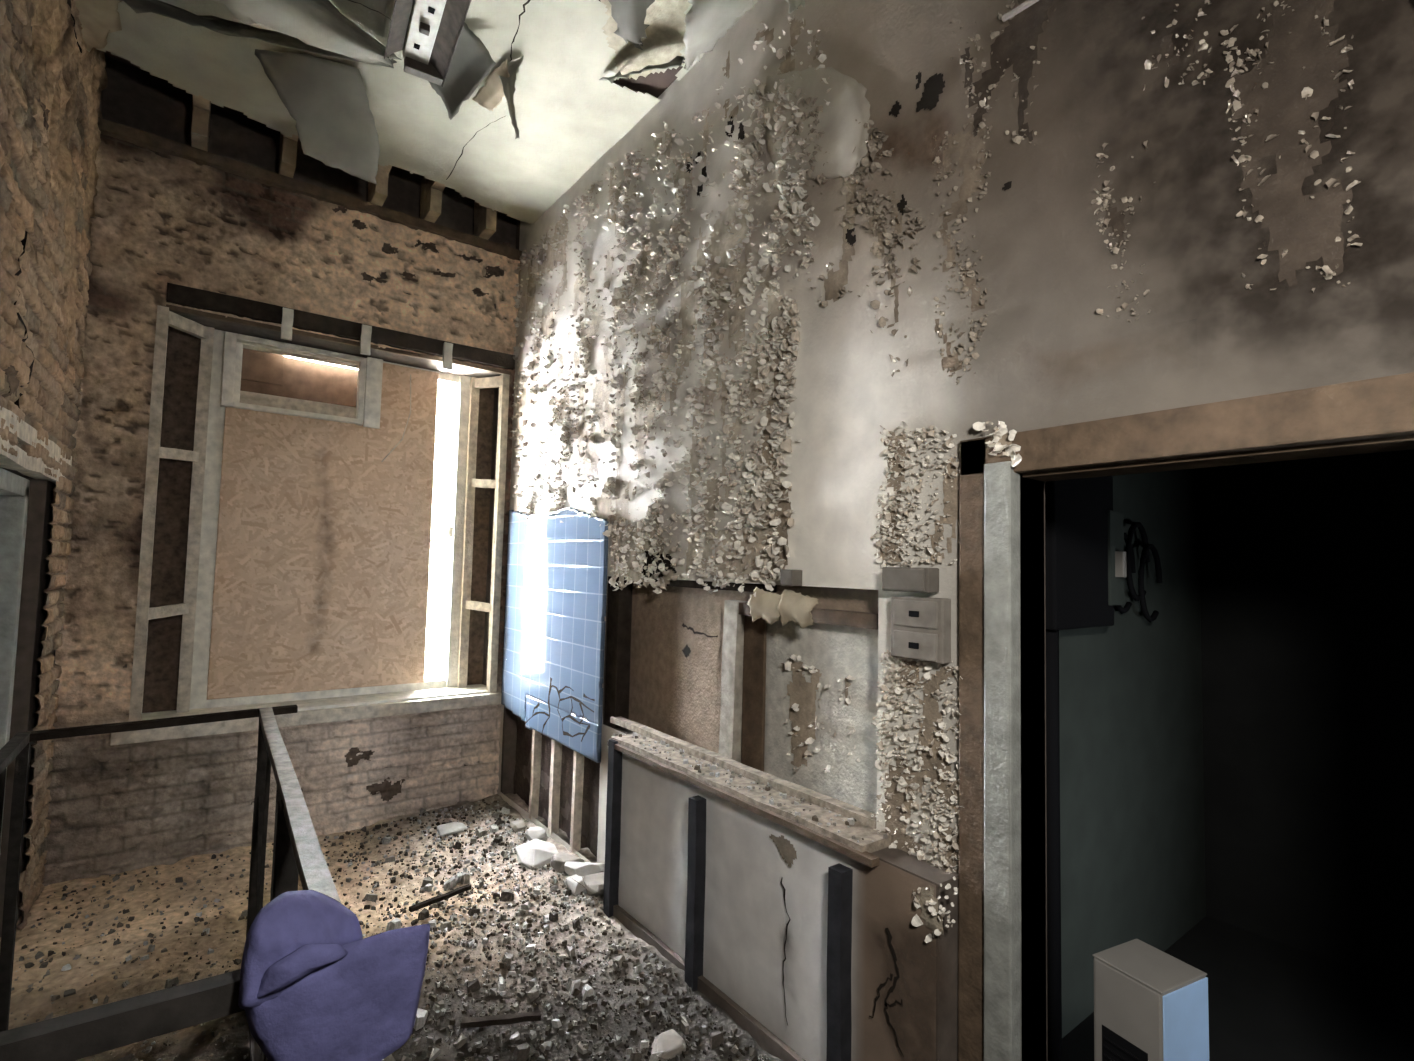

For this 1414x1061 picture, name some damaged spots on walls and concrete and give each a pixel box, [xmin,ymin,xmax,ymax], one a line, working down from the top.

crack [510,0,531,61]
crack [446,116,505,180]
peeling [1142,0,1363,292]
peeling [1091,143,1151,322]
peeling [361,0,1056,597]
spalling [2,365,20,398]
crack [524,677,595,742]
crack [869,928,904,1057]